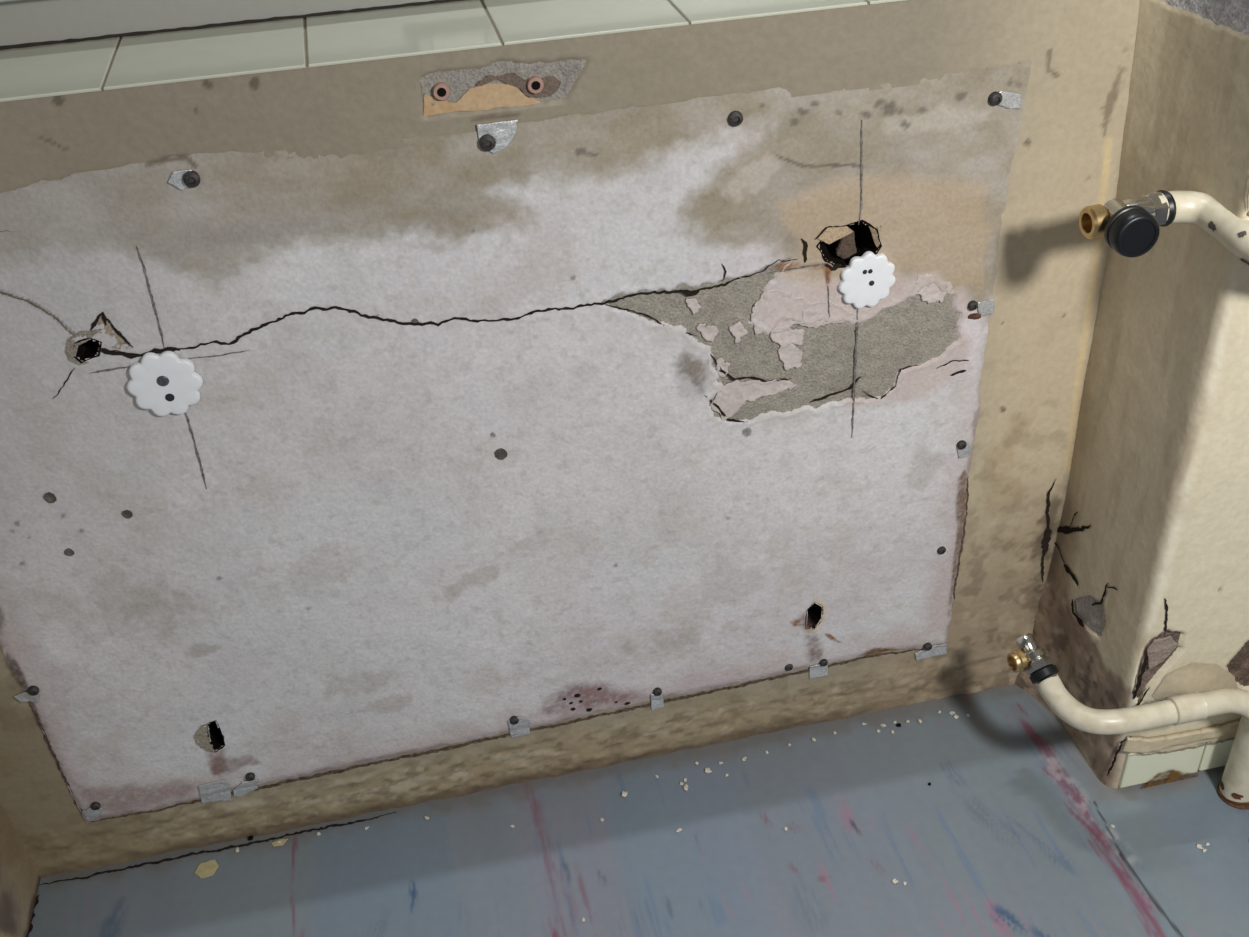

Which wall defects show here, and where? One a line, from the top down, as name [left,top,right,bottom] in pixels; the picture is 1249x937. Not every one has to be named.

flaking render [1164,0,1249,36]
crack [0,259,797,357]
flaking render [0,59,1032,822]
crack [1041,480,1091,586]
water stain [559,686,630,712]
flaking render [1071,583,1118,637]
flaking render [1133,598,1181,706]
flaking render [1227,640,1249,686]